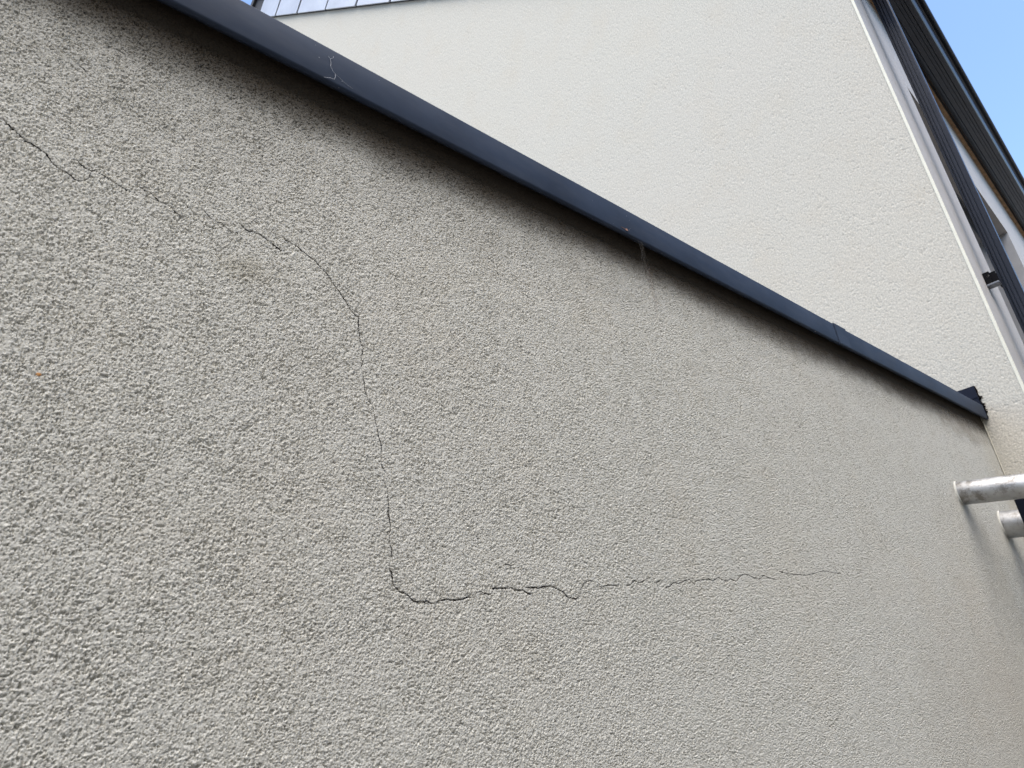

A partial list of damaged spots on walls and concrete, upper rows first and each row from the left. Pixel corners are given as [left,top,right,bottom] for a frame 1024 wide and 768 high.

crack [1,119,839,604]